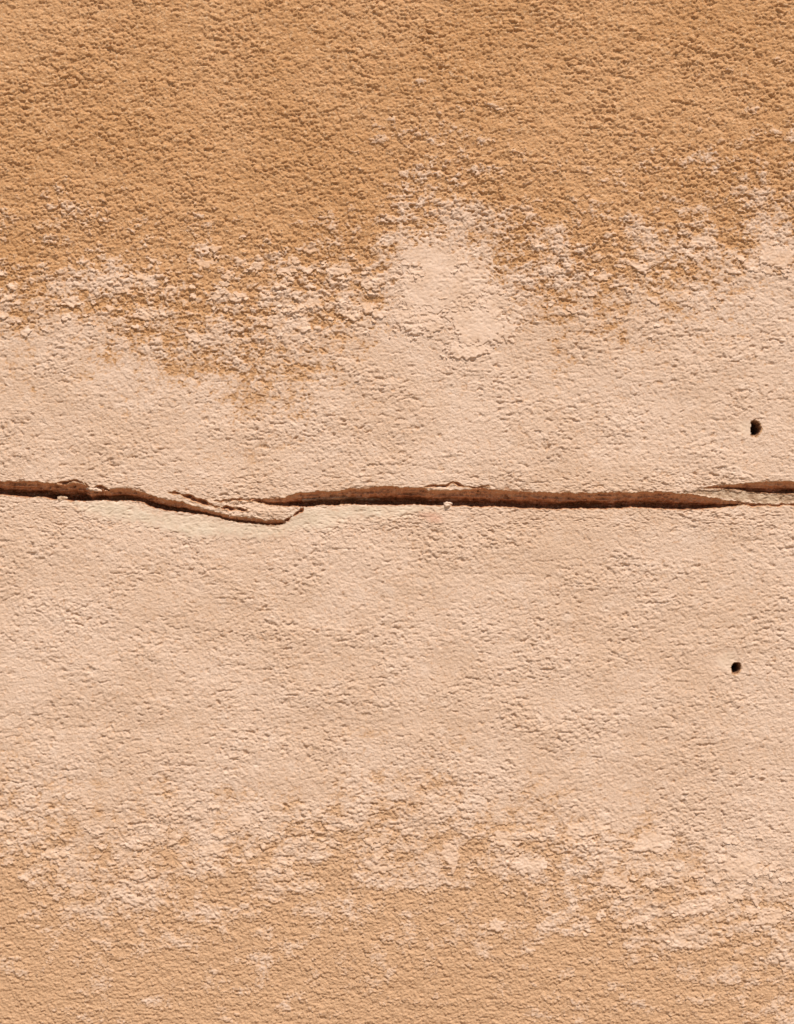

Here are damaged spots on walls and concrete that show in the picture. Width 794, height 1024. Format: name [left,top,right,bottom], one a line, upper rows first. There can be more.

flaking render [543,243,581,276]
flaking render [588,235,658,296]
flaking render [647,224,719,307]
flaking render [726,234,794,284]
flaking render [0,269,49,337]
flaking render [50,228,539,367]
flaking render [540,294,581,316]
crack [0,478,794,526]